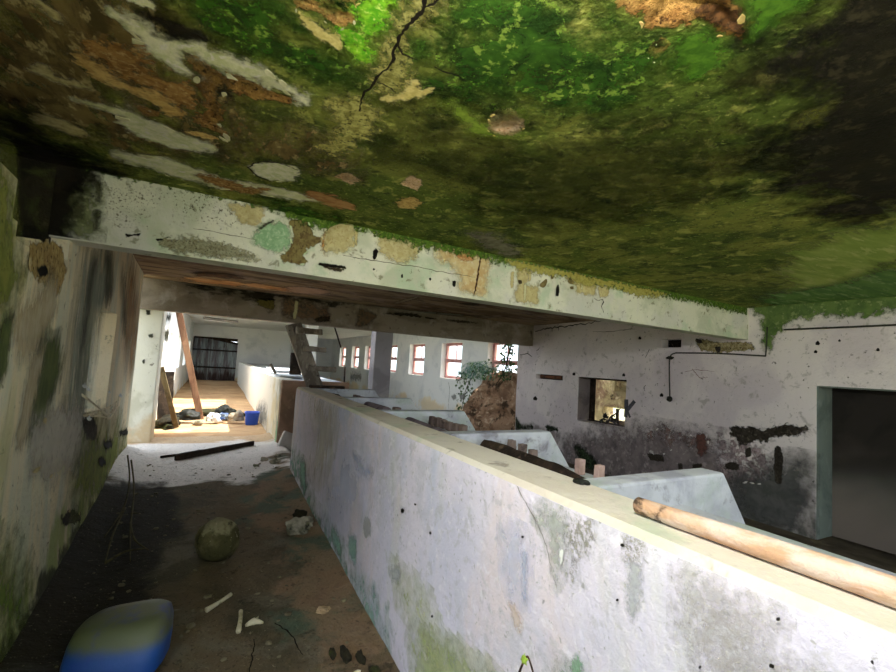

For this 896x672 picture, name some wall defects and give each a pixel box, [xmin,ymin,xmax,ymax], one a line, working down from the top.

peeling [28,63,90,89]
peeling [106,0,310,106]
crack [359,0,466,111]
peeling [29,113,88,136]
peeling [70,97,230,153]
water stain [691,0,896,228]
peeling [110,150,320,202]
spalling [28,239,67,296]
spalling [280,220,322,266]
water stain [0,278,58,450]
water stain [562,424,817,533]
spalling [647,422,808,485]